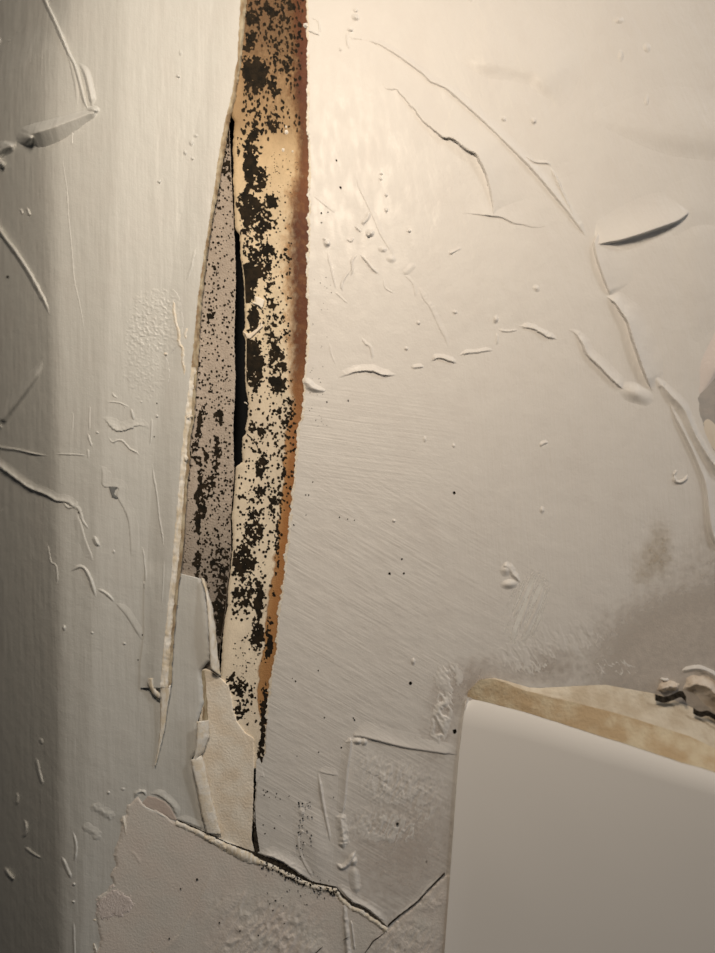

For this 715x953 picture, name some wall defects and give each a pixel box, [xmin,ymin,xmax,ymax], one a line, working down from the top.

leakage [183,0,304,764]
crack [176,0,335,782]
spalling [698,333,715,451]
peeling [93,789,450,953]
crack [176,809,445,953]